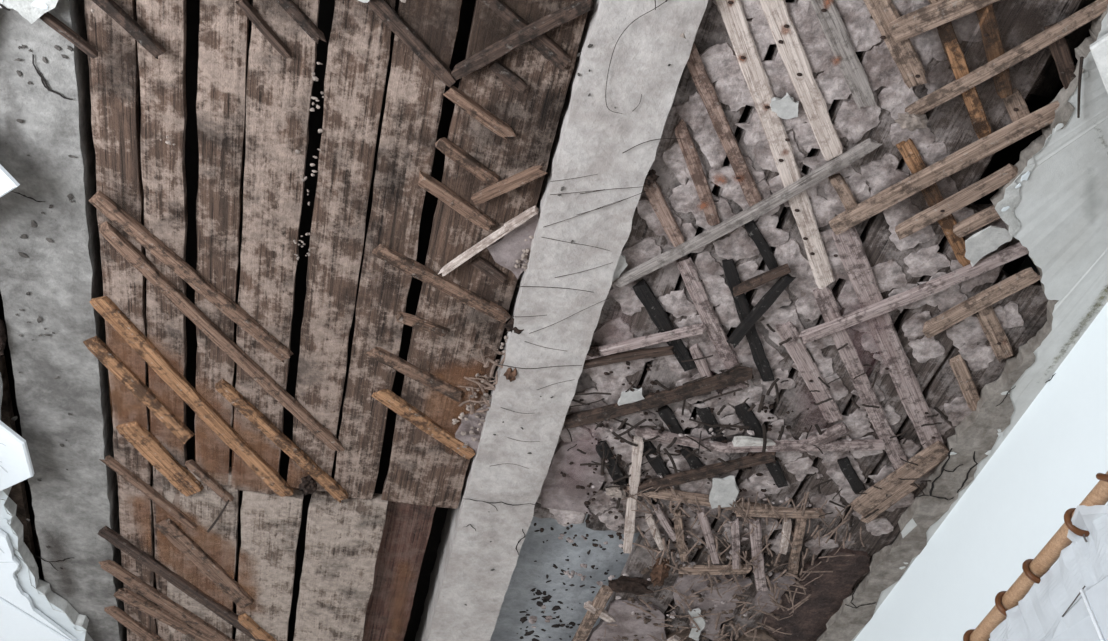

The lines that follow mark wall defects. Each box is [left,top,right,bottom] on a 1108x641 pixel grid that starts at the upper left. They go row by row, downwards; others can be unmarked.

peeling [0,0,58,24]
spalling [964,70,1089,242]
spalling [517,0,1036,641]